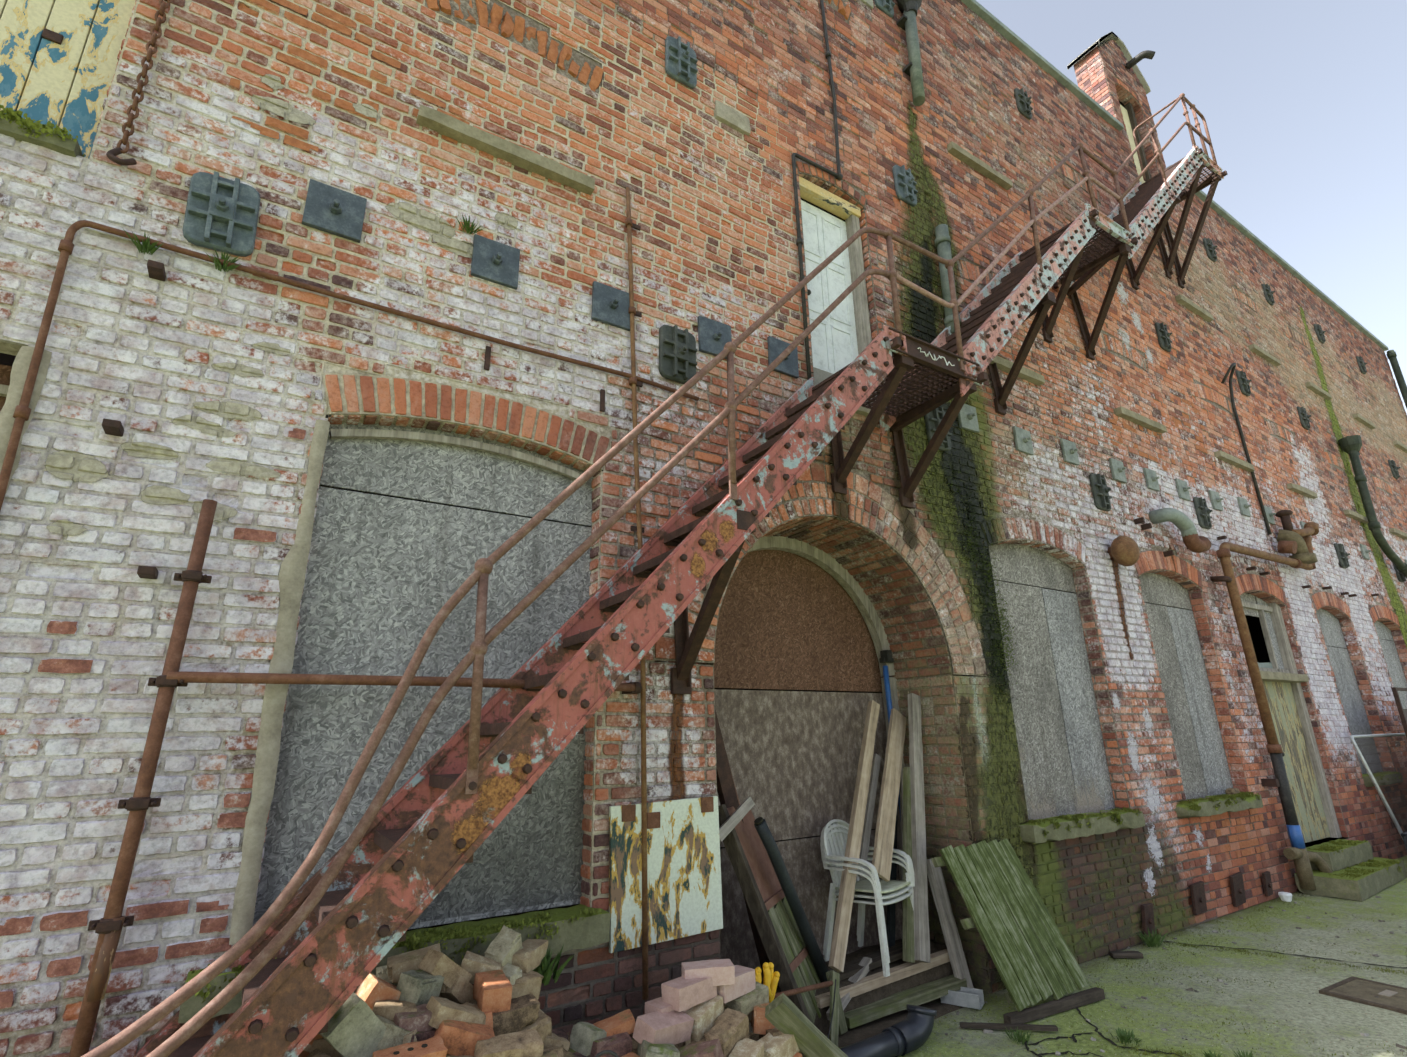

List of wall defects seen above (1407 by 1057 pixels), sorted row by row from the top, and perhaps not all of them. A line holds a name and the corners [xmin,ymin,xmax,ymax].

leakage [897,104,960,343]
leakage [826,441,850,522]
corrosion [690,520,735,578]
leakage [892,384,1011,700]
corrosion [452,753,532,854]
corrosion [622,805,660,829]
corrosion [668,694,782,902]
leakage [957,696,984,844]
leakage [1008,761,1029,824]
crack [1024,1008,1184,1057]